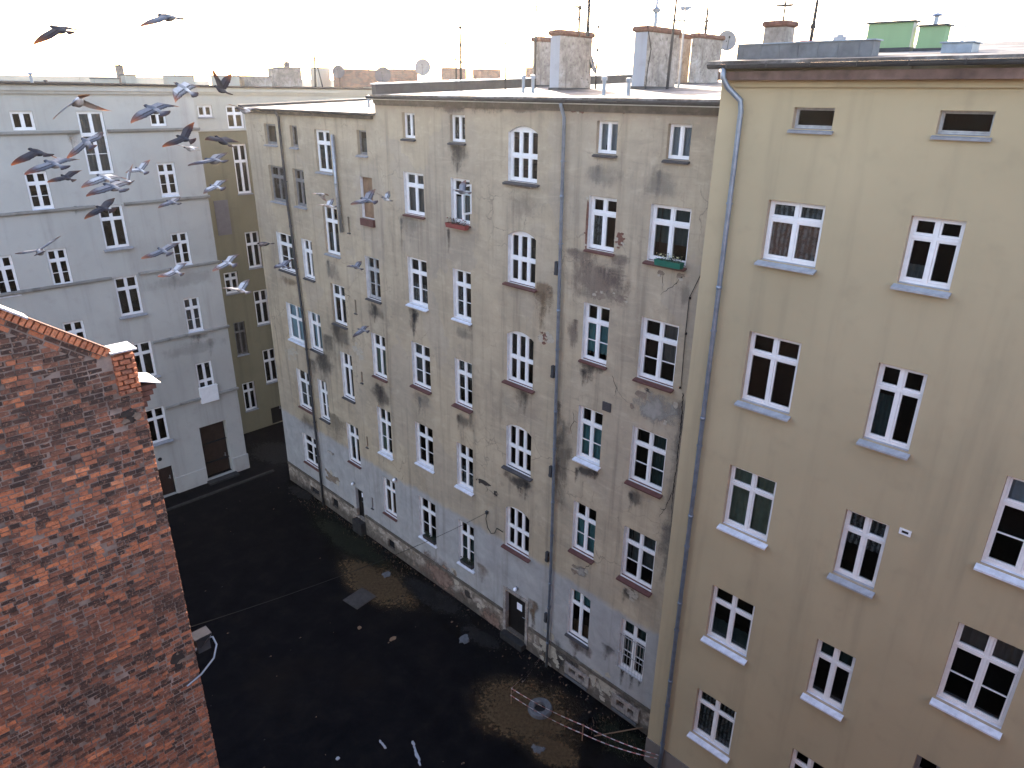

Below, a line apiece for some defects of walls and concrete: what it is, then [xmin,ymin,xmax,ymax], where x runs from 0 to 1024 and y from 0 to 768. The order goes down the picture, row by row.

spalling [614,232,625,248]
crack [659,393,684,522]
flaking render [588,669,616,702]